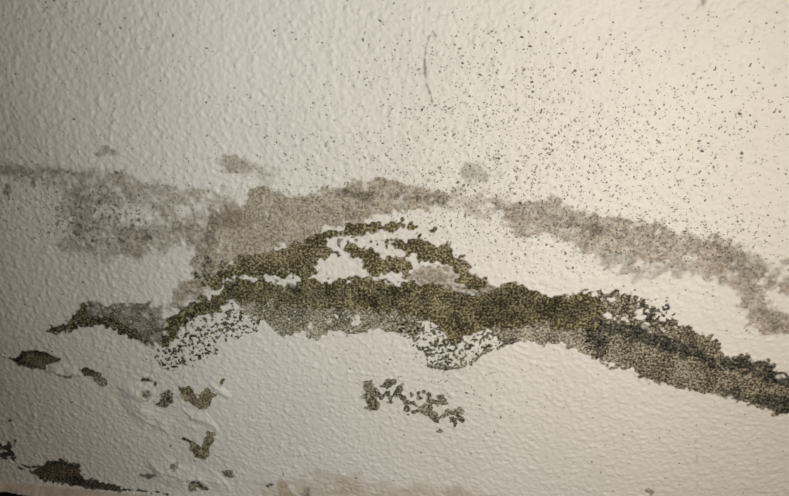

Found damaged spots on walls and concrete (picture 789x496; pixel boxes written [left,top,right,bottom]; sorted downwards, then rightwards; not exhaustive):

leakage [3,121,789,416]
peeling [9,350,60,370]
peeling [81,367,107,387]
peeling [141,378,217,410]
peeling [182,431,215,460]
peeling [0,439,169,496]